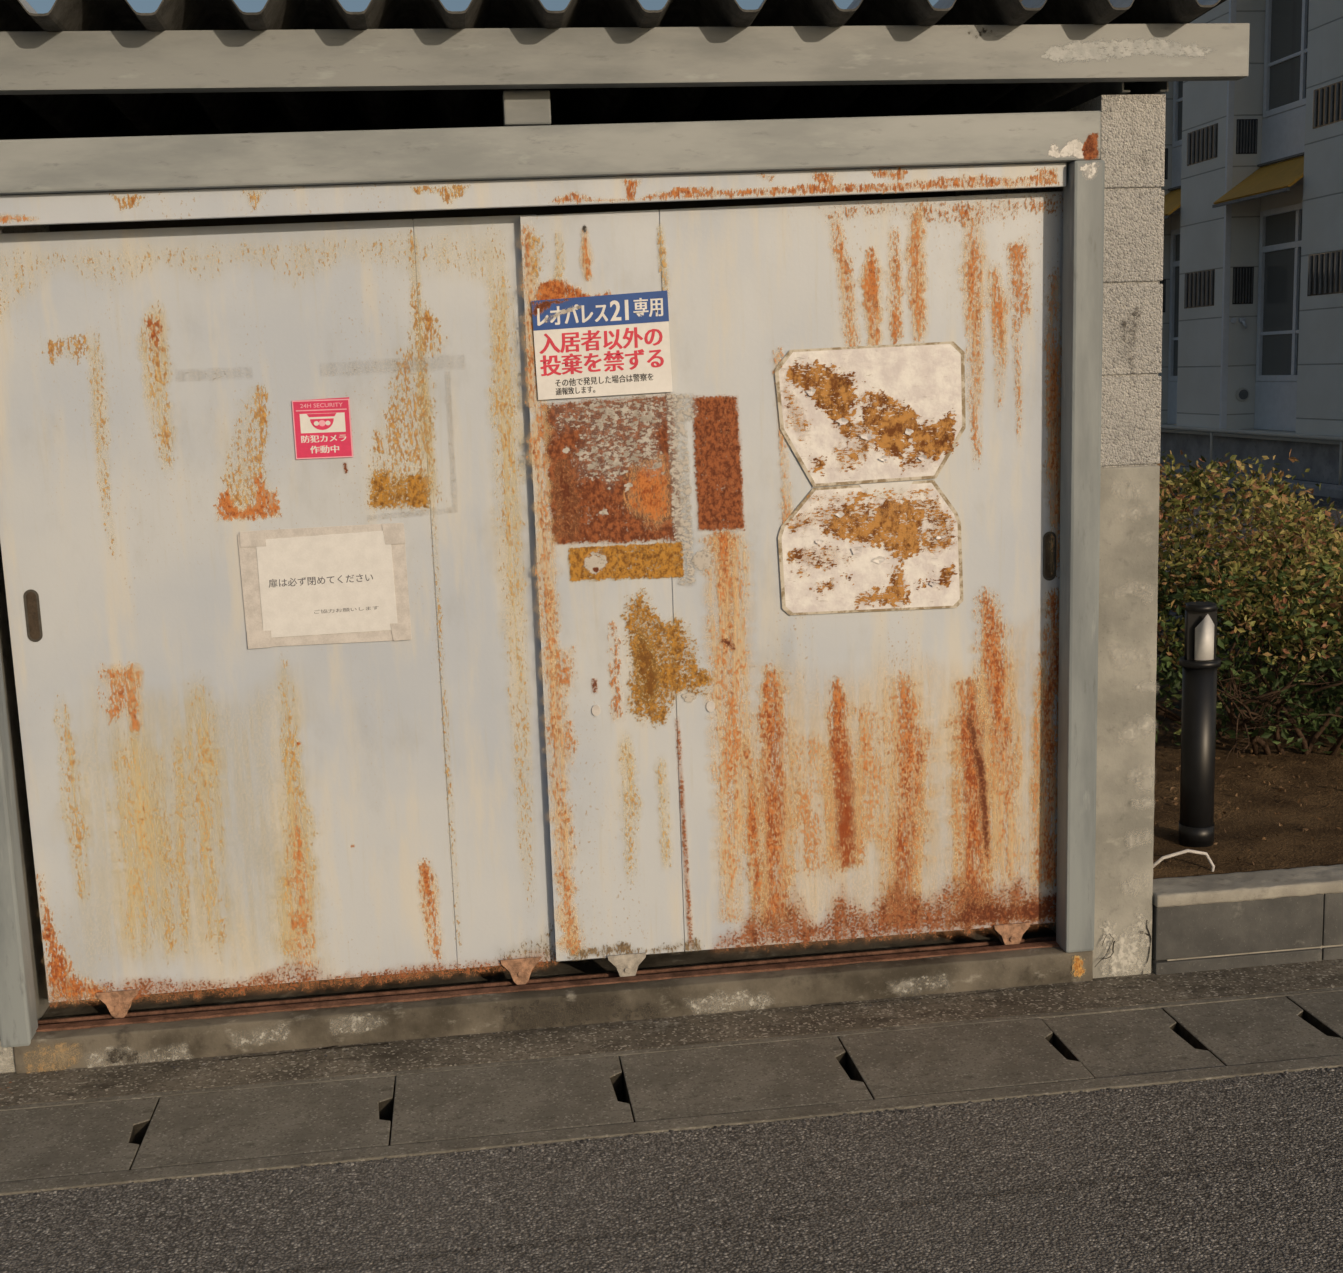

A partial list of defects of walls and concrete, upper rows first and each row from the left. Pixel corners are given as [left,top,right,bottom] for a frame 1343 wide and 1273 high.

corrosion [0,167,1063,1007]
corrosion [1070,956,1086,977]